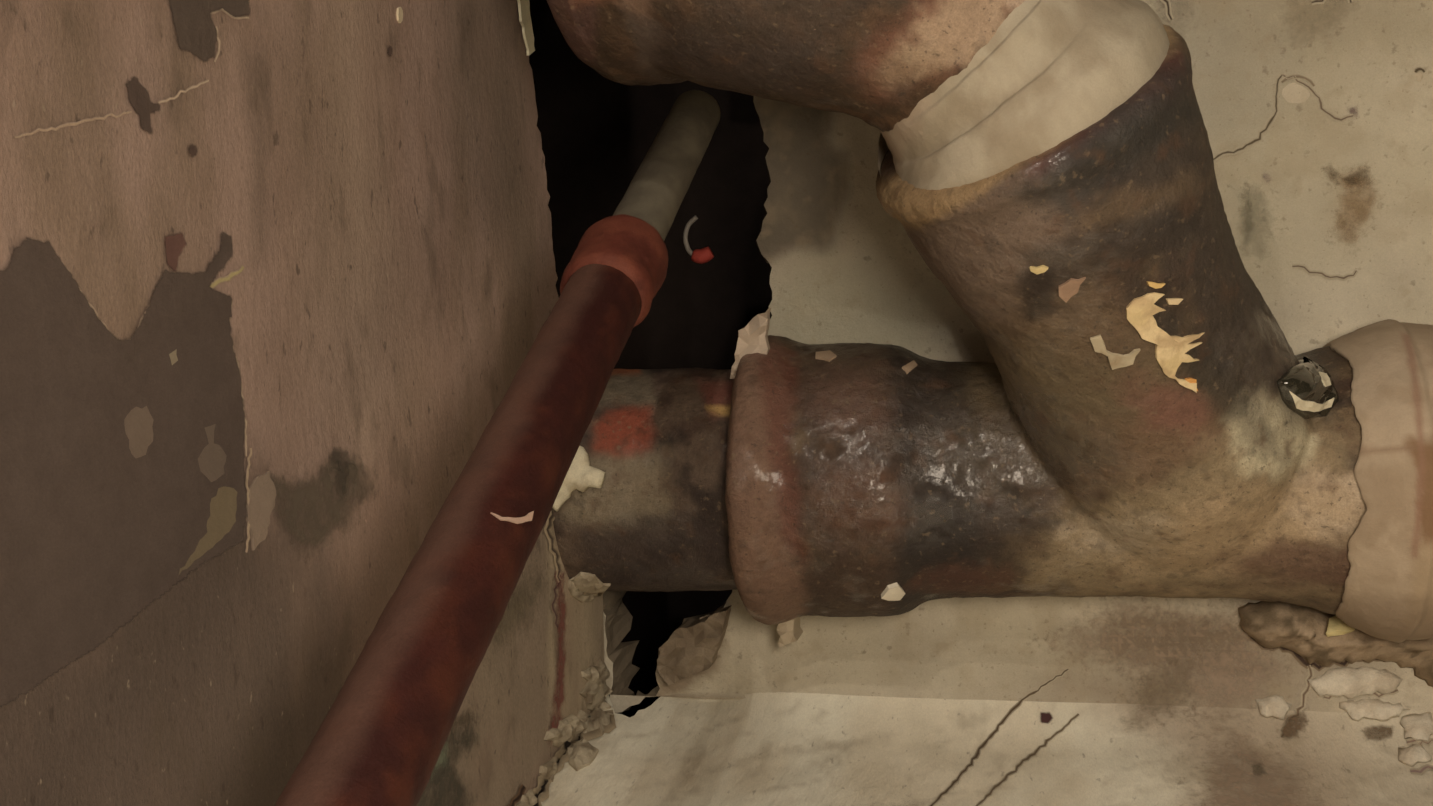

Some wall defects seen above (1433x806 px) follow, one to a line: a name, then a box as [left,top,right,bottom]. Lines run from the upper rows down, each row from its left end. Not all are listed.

peeling [169,0,250,63]
crack [1160,0,1174,21]
peeling [15,77,209,138]
crack [1213,73,1355,162]
peeling [0,232,276,707]
crack [929,668,1080,806]
flaking render [1256,695,1307,737]
flaking render [1308,666,1433,767]